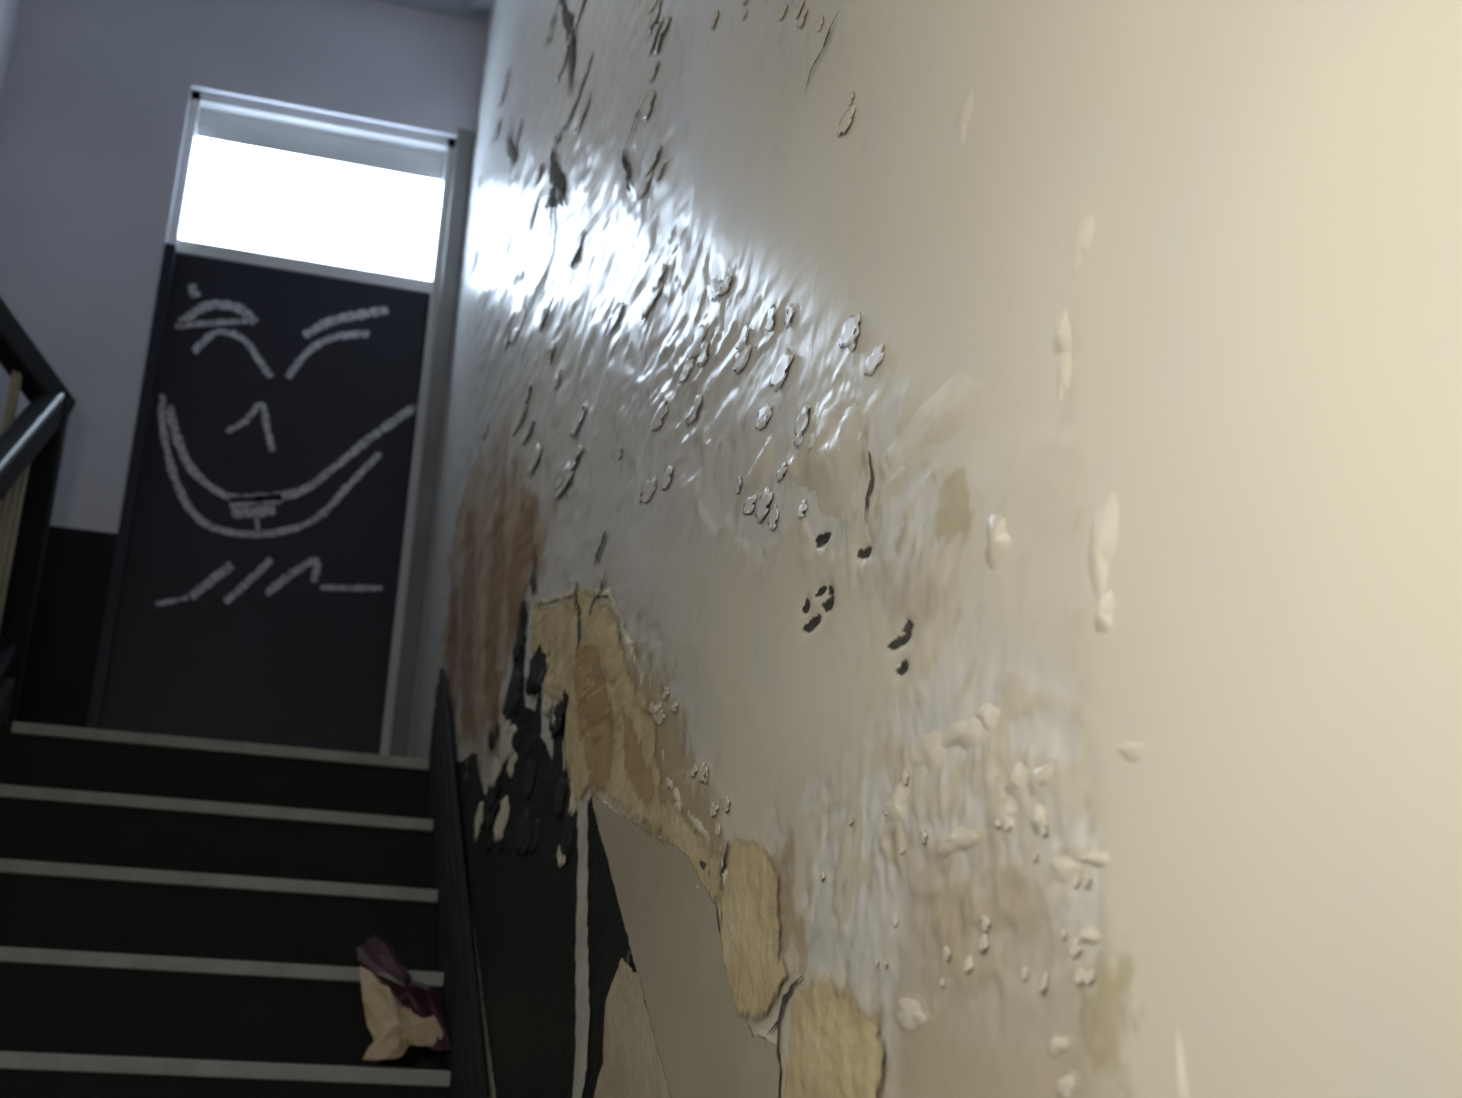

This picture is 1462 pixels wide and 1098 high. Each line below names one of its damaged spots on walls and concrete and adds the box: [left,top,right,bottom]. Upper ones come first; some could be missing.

peeling [642,0,670,122]
peeling [637,143,666,200]
peeling [566,228,585,269]
peeling [553,406,586,501]
peeling [474,585,883,1098]
peeling [940,915,990,987]
peeling [1061,926,1095,985]